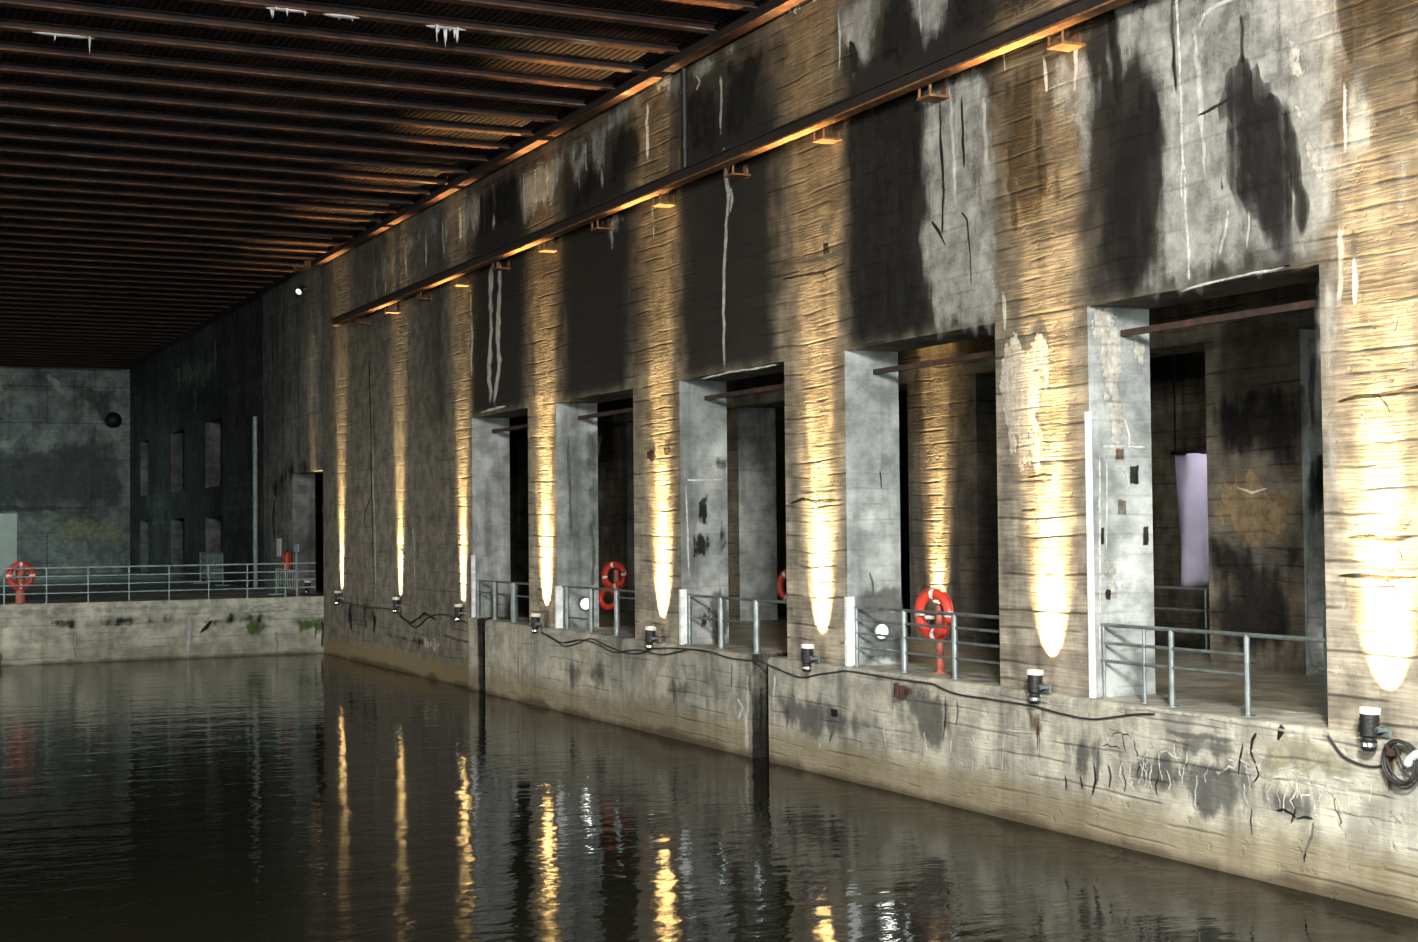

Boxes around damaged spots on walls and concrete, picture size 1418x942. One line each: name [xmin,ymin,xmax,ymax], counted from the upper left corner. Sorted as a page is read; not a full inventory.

leakage [470,263,505,413]
leakage [374,97,649,297]
leakage [654,47,762,150]
leakage [704,166,775,379]
leakage [849,66,994,338]
leakage [1104,0,1370,667]
crack [1238,724,1314,862]